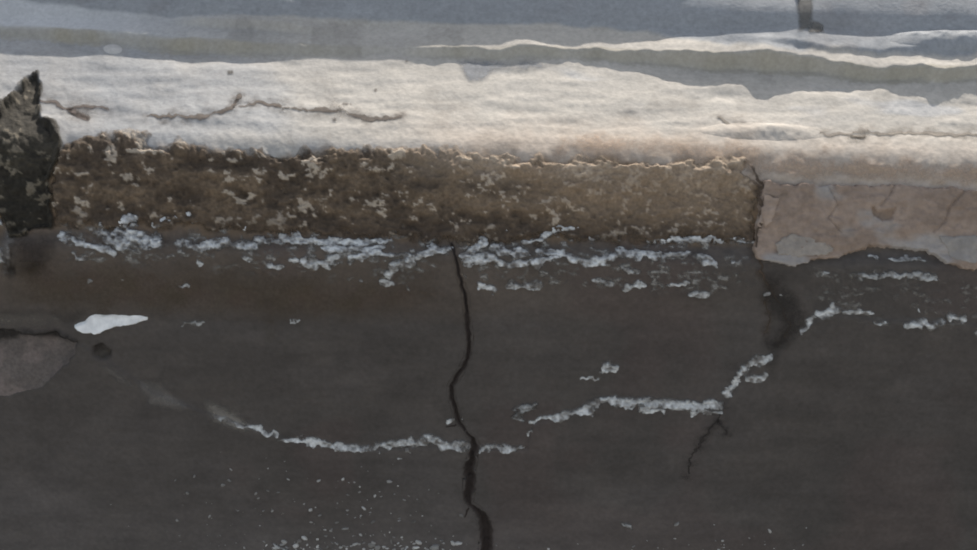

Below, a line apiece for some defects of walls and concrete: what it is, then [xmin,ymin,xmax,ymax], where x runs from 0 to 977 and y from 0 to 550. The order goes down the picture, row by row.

spalling [0,70,977,271]
leakage [0,211,754,299]
leakage [851,254,938,282]
spalling [0,314,148,396]
crack [446,237,495,550]
leakage [207,281,887,460]
crack [688,410,728,474]
leakage [263,478,468,550]